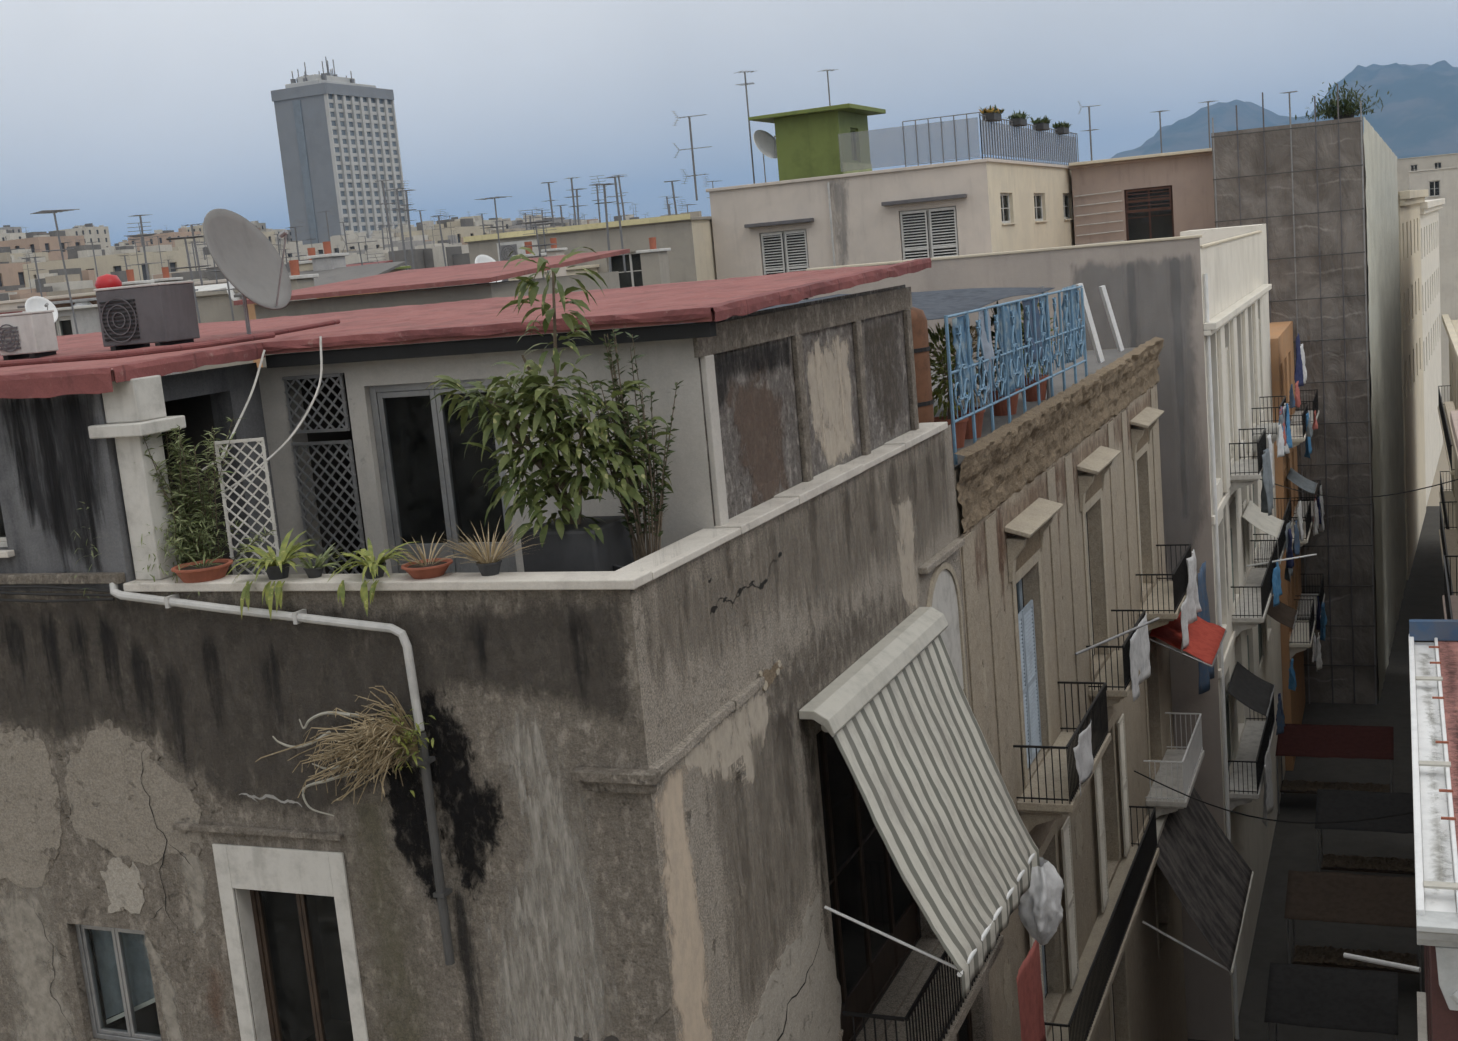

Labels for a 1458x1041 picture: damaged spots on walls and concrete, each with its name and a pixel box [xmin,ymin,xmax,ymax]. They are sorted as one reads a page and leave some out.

damp [714,340,790,405]
damp [3,398,100,571]
crack [714,556,781,611]
flaking render [0,719,202,914]
damp [0,596,626,1041]
crack [777,927,823,1041]